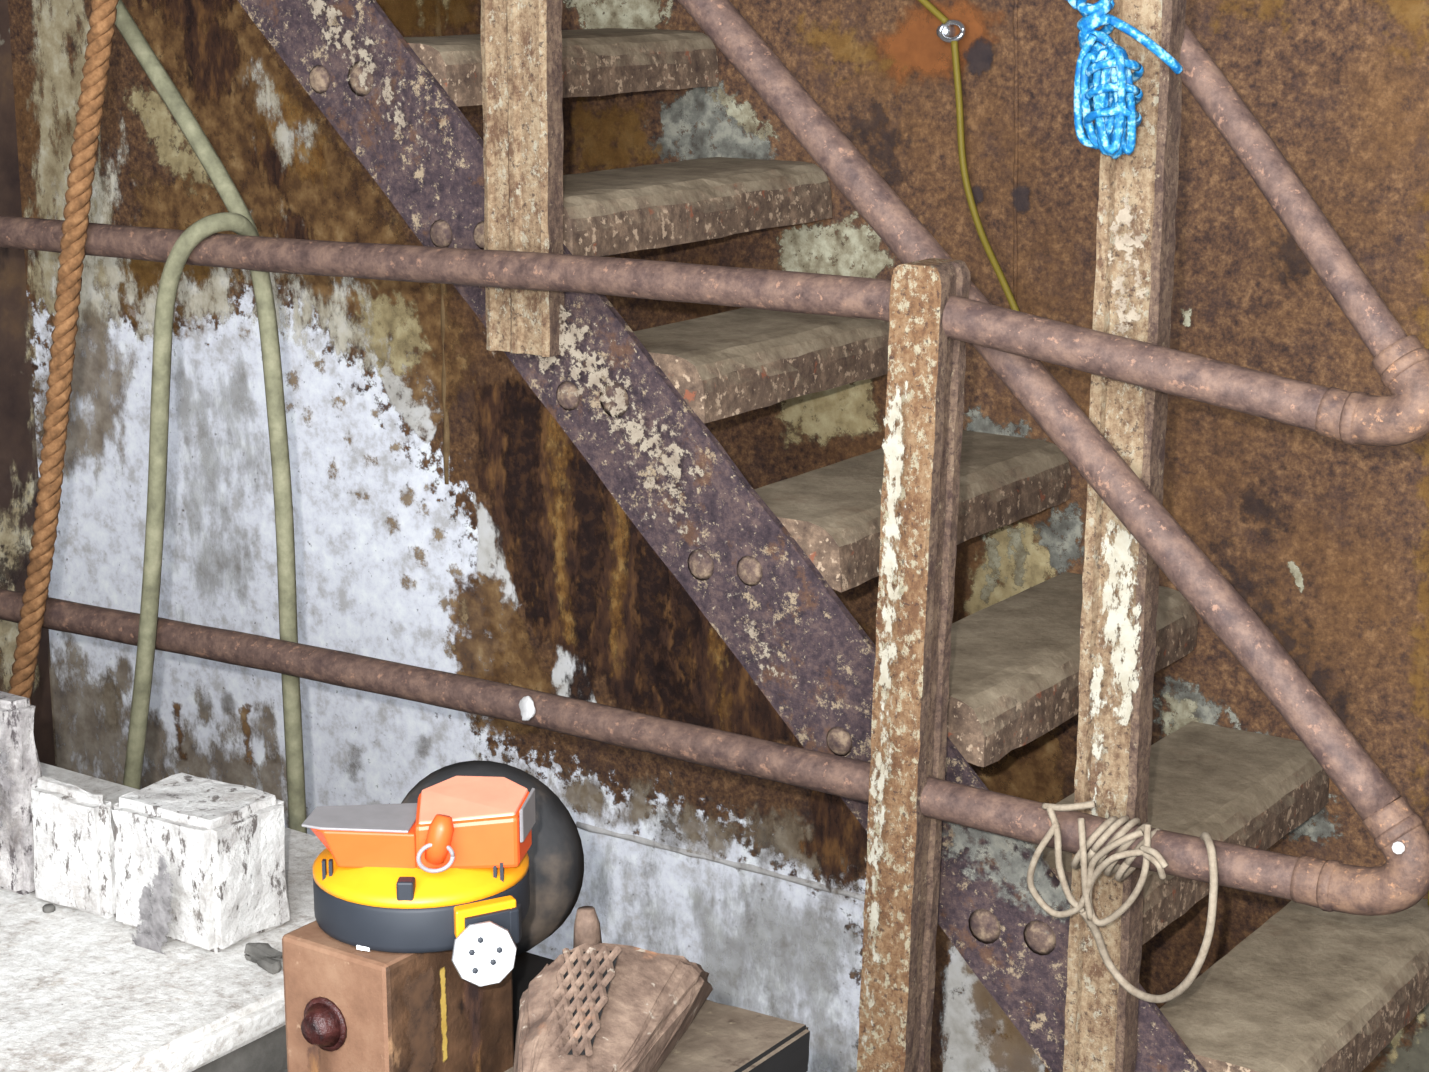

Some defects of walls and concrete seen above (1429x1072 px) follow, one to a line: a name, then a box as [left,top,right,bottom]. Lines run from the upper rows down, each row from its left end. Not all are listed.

corrosion [129,0,405,245]
corrosion [799,0,1000,83]
peeling [48,255,157,614]
corrosion [105,259,165,324]
peeling [158,267,280,639]
peeling [269,272,518,674]
corrosion [272,273,804,748]
corrosion [778,379,878,447]
peeling [34,629,137,780]
peeling [142,650,288,828]
peeling [300,380,908,1072]
corrosion [676,790,867,892]